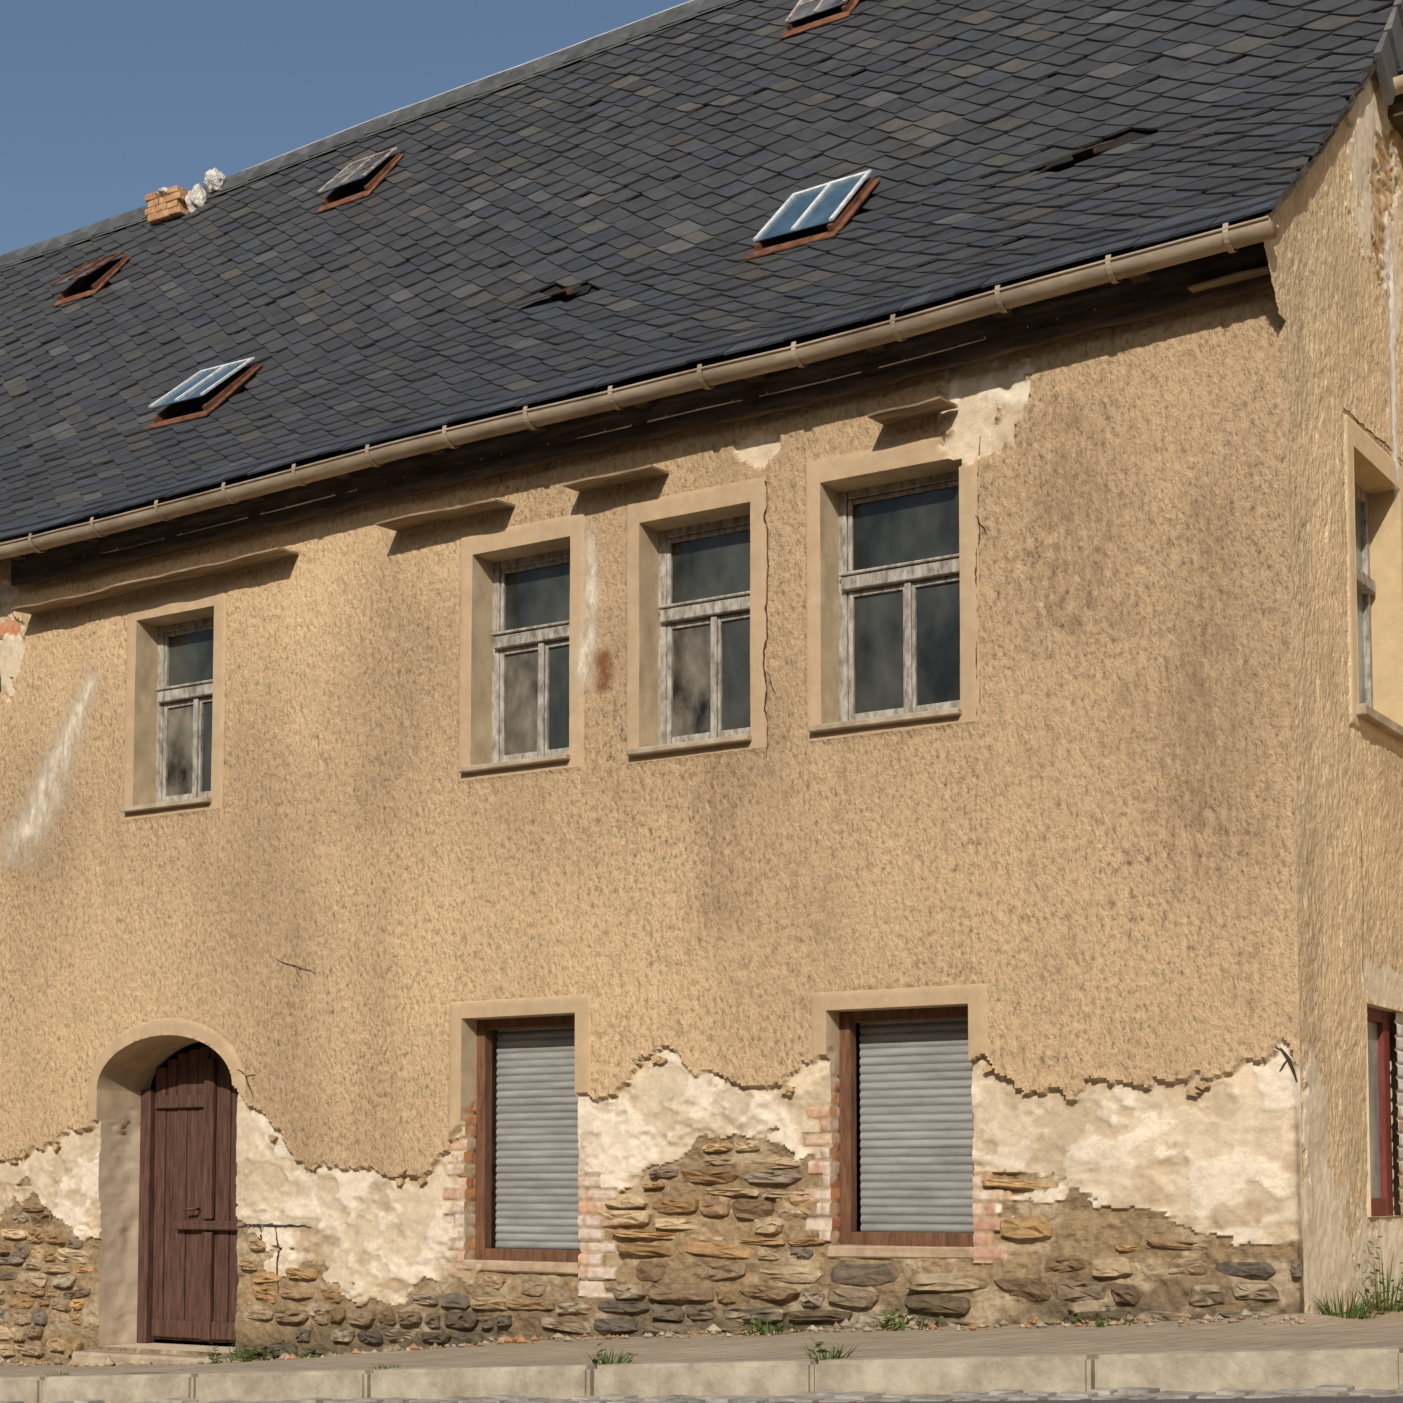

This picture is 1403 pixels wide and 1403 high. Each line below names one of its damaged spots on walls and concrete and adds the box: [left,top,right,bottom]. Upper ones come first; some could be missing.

spalling [1343,69,1403,338]
spalling [934,356,1036,464]
spalling [0,579,25,701]
corrosion [597,652,609,689]
damp [7,676,96,859]
spalling [0,1037,1403,1363]